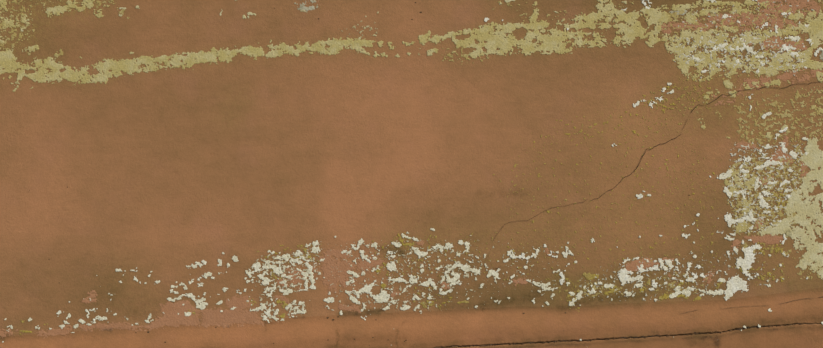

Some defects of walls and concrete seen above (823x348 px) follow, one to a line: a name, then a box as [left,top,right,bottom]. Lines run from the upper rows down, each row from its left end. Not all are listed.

peeling [0,0,400,92]
peeling [633,83,700,116]
crack [436,323,817,348]